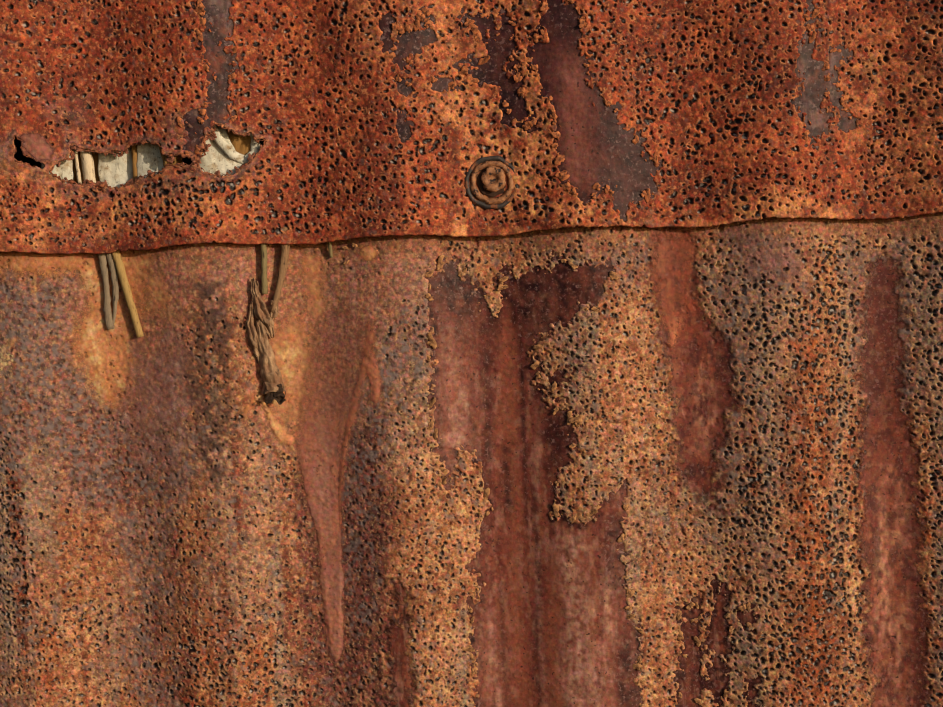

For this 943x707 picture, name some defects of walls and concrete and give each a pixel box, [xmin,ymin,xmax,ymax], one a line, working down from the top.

rust [19,133,55,162]
rust [172,0,246,155]
peeling [214,144,264,178]
rust [377,6,438,148]
rust [427,0,664,221]
rust [789,0,859,150]
rust [0,250,152,403]
rust [647,230,740,515]
rust [242,319,381,662]
rust [418,251,647,707]
rust [854,257,936,707]
rust [669,574,737,707]